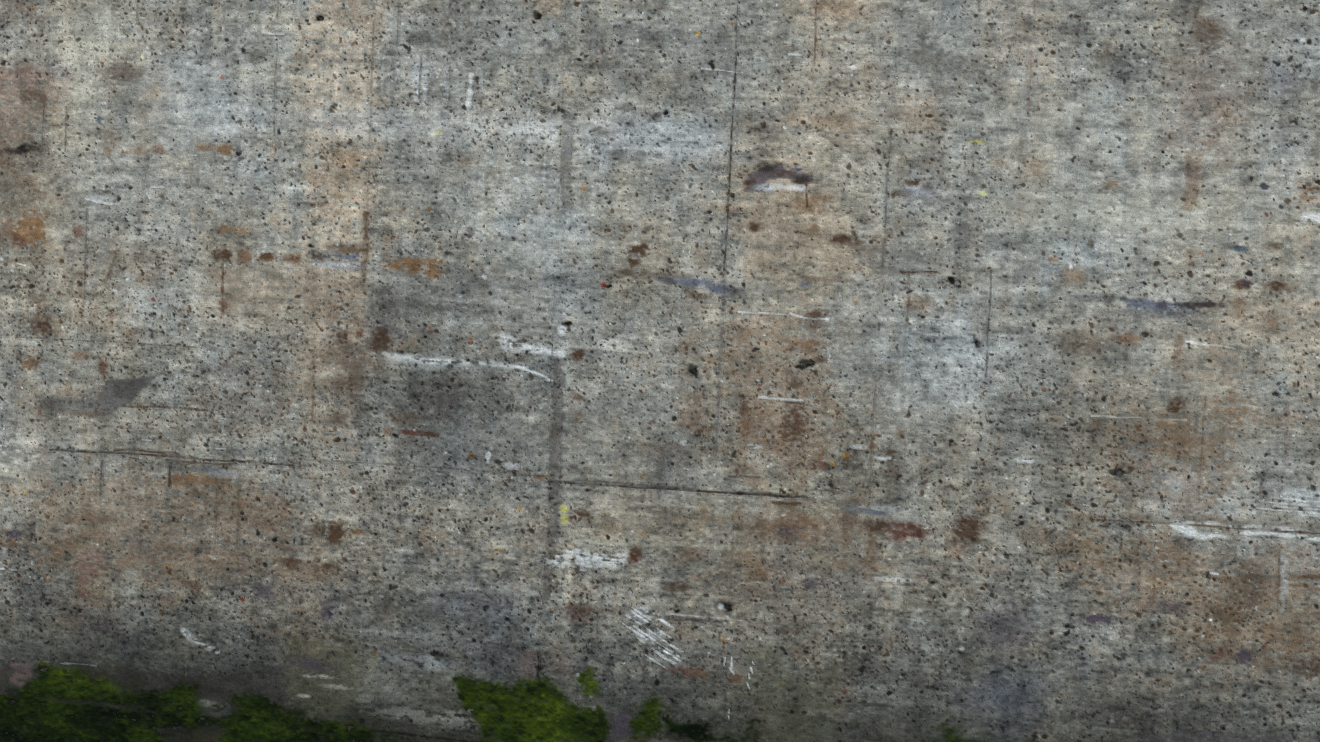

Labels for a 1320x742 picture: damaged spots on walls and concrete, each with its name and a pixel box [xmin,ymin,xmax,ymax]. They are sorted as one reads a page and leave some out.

corrosion [0,0,449,623]
corrosion [611,0,989,649]
corrosion [567,349,589,364]
corrosion [567,506,597,527]
corrosion [530,602,655,628]
damp [179,626,221,655]
damp [723,656,756,690]
damp [294,673,479,735]